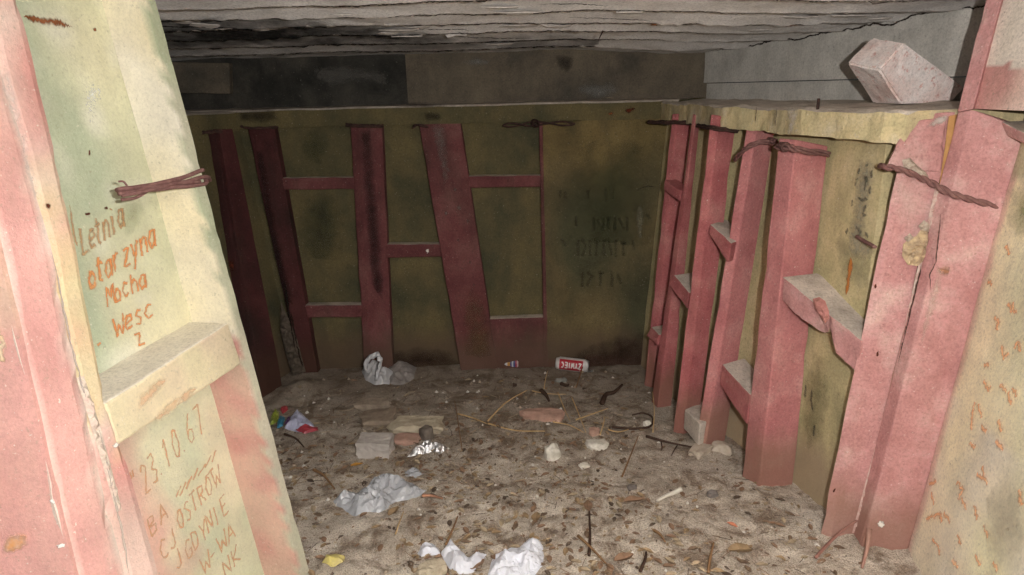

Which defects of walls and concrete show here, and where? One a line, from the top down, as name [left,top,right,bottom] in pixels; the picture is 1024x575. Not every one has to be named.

corrosion [24,15,72,28]
crack [162,0,928,53]
crack [899,214,941,358]